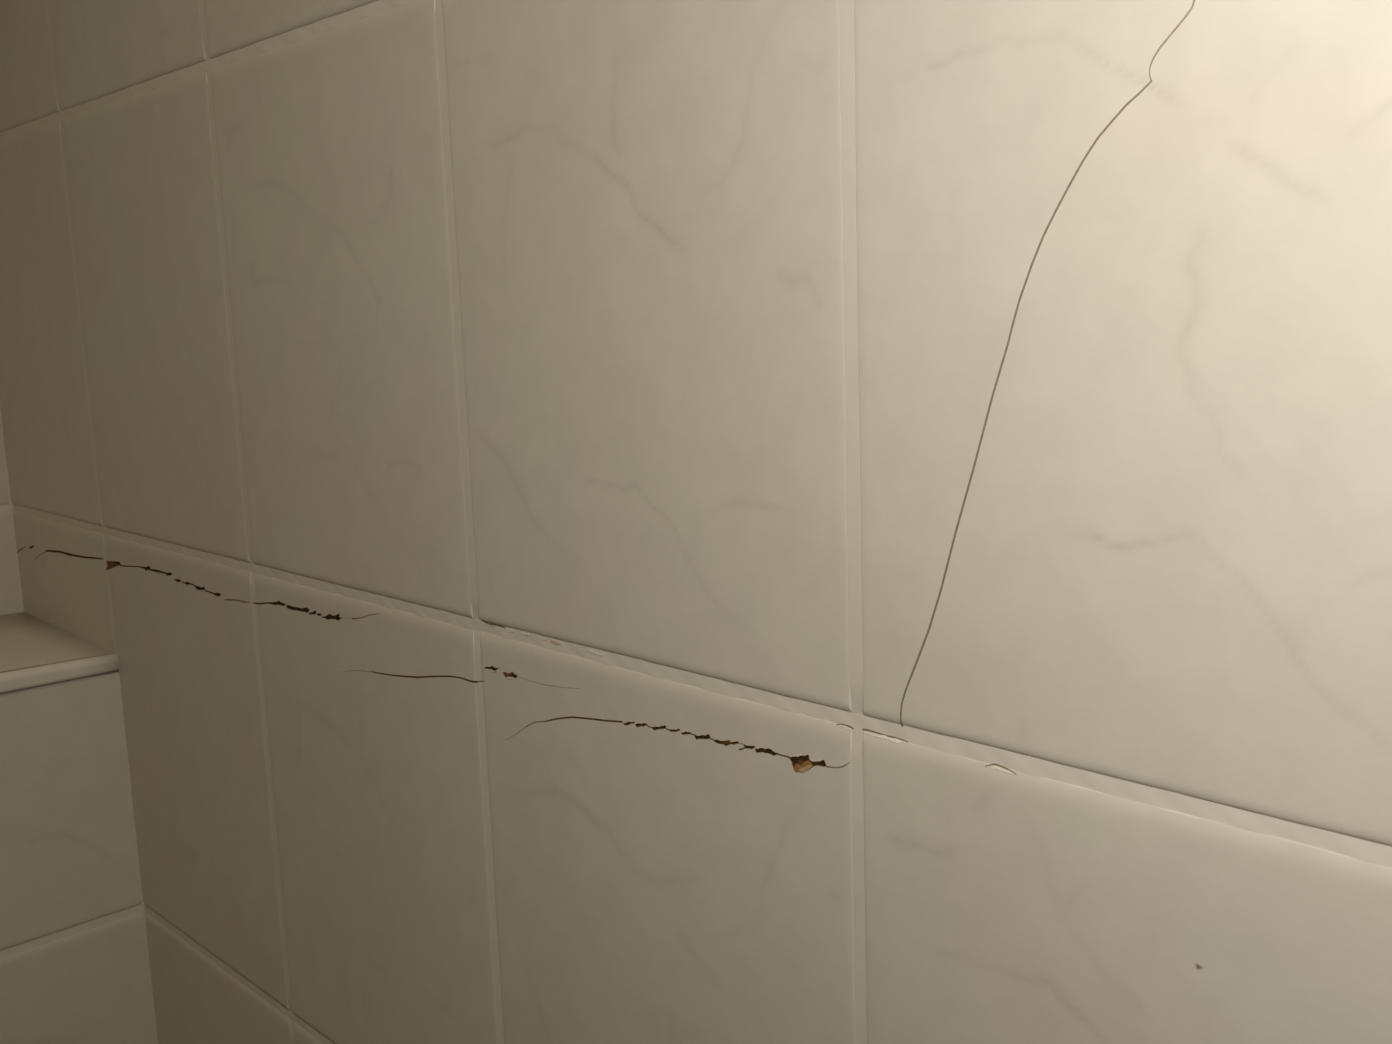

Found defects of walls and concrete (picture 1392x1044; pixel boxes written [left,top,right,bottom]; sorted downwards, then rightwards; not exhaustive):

crack [505,0,1195,774]
crack [17,546,380,620]
crack [343,670,482,683]